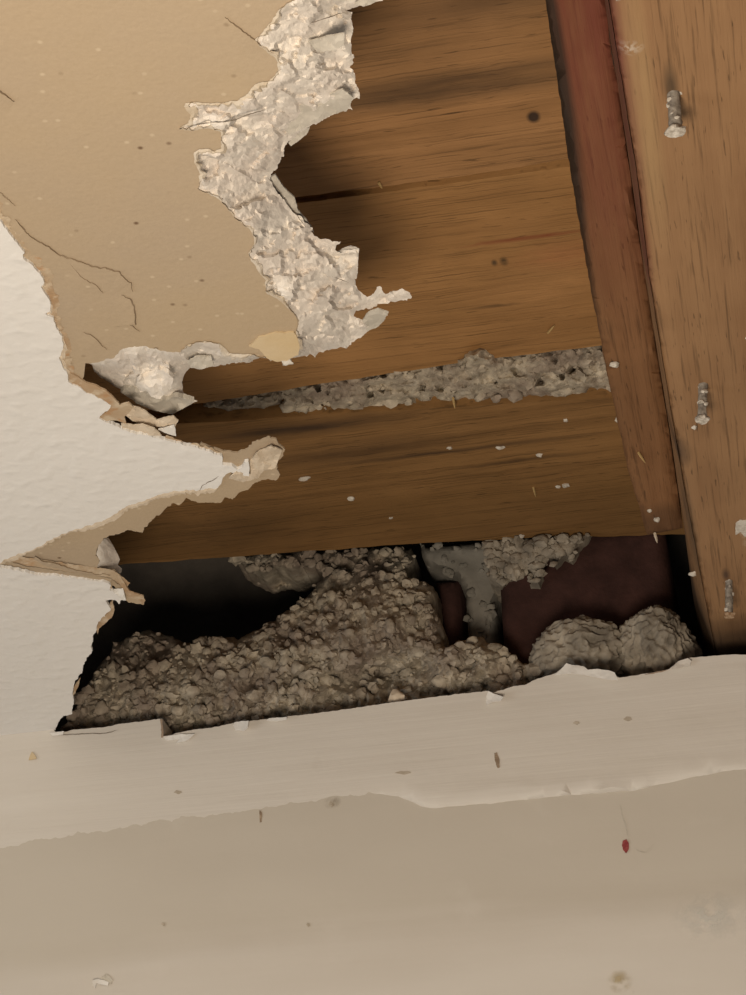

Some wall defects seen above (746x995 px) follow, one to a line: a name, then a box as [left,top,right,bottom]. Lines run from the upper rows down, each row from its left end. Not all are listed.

peeling [0,0,412,415]
spalling [0,436,313,693]
spalling [340,540,484,591]
spalling [666,514,716,655]
flaking render [555,663,618,680]
flaking render [645,658,692,675]
flaking render [486,691,503,705]
spalling [50,705,77,736]
flaking render [163,734,194,743]
flaking render [233,721,249,731]